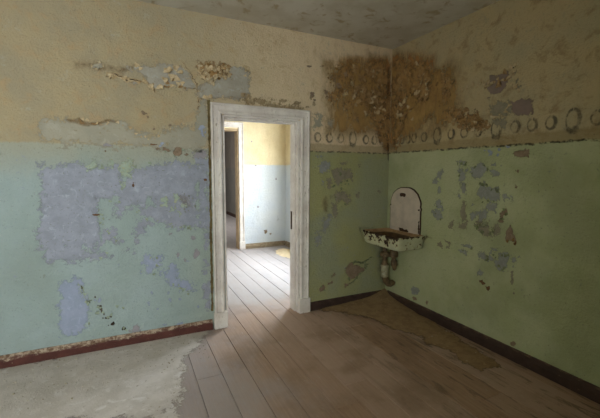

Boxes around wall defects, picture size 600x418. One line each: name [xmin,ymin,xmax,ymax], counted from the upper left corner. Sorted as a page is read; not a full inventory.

peeling [419,69,535,132]
peeling [32,60,333,312]
peeling [448,145,530,294]